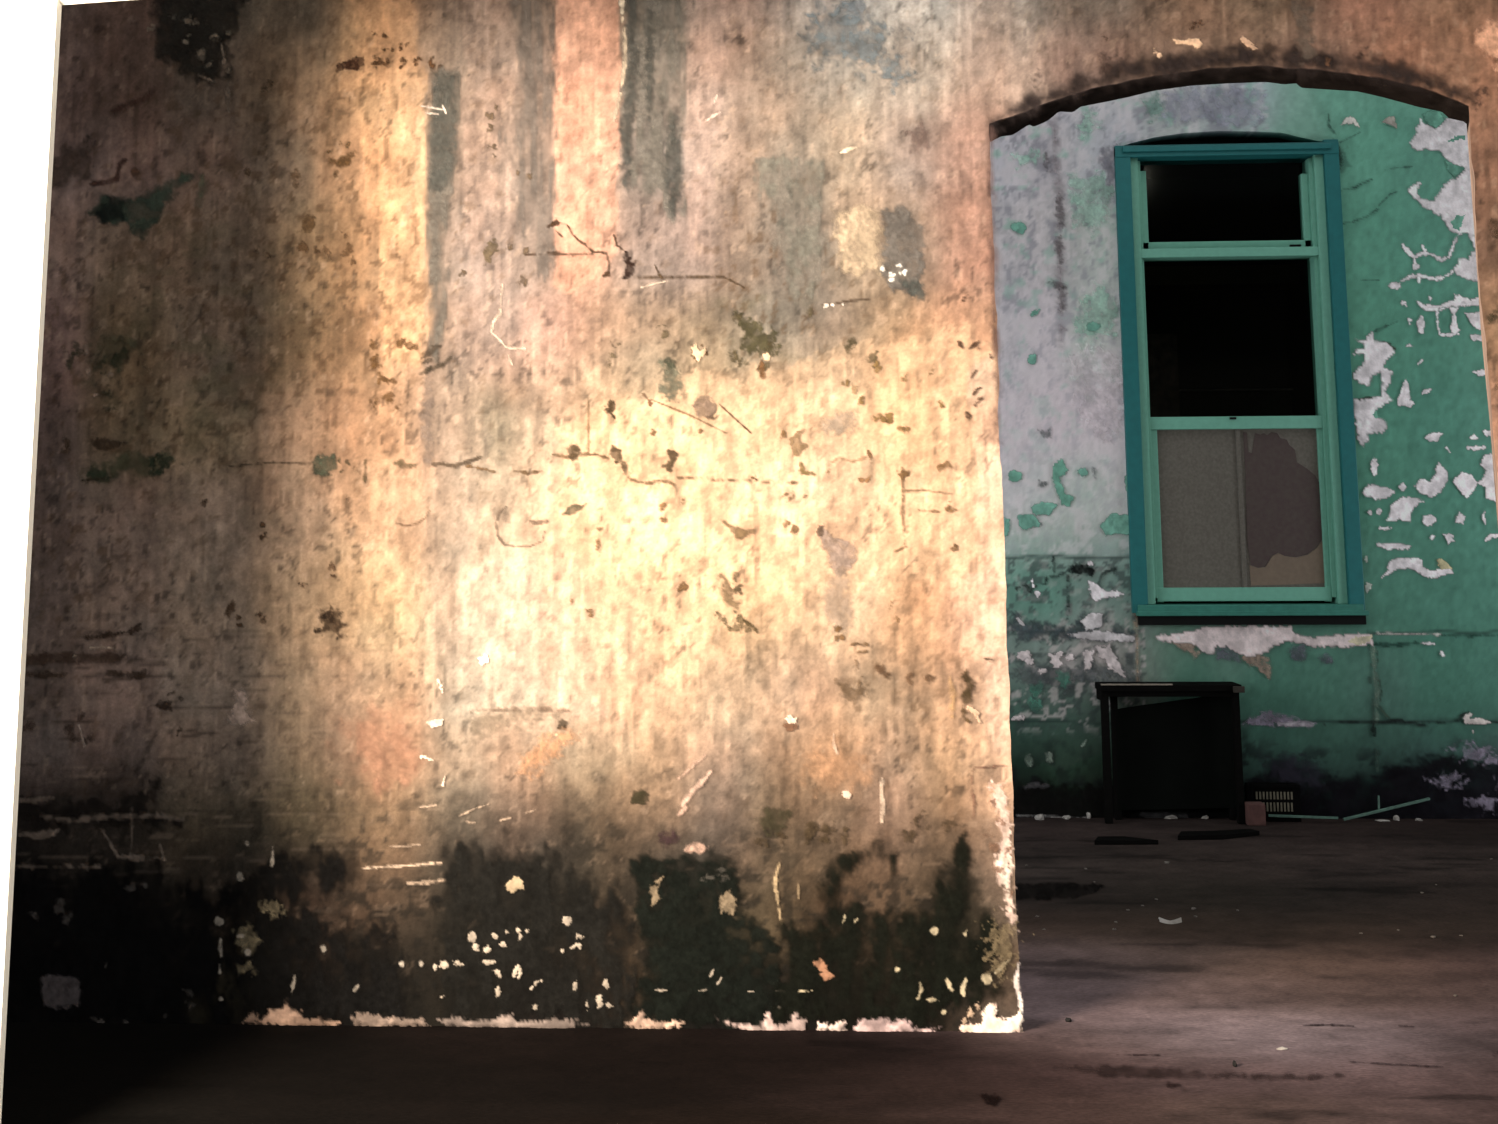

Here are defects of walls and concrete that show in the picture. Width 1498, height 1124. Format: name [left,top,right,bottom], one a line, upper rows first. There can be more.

damp [147,0,246,112]
damp [483,0,554,286]
damp [613,0,686,222]
damp [421,68,466,441]
peeling [1353,110,1498,593]
damp [312,454,366,482]
peeling [1004,502,1058,537]
peeling [1100,513,1129,535]
flaking render [1011,612,1445,720]
damp [1253,741,1498,819]
damp [8,777,1013,1030]